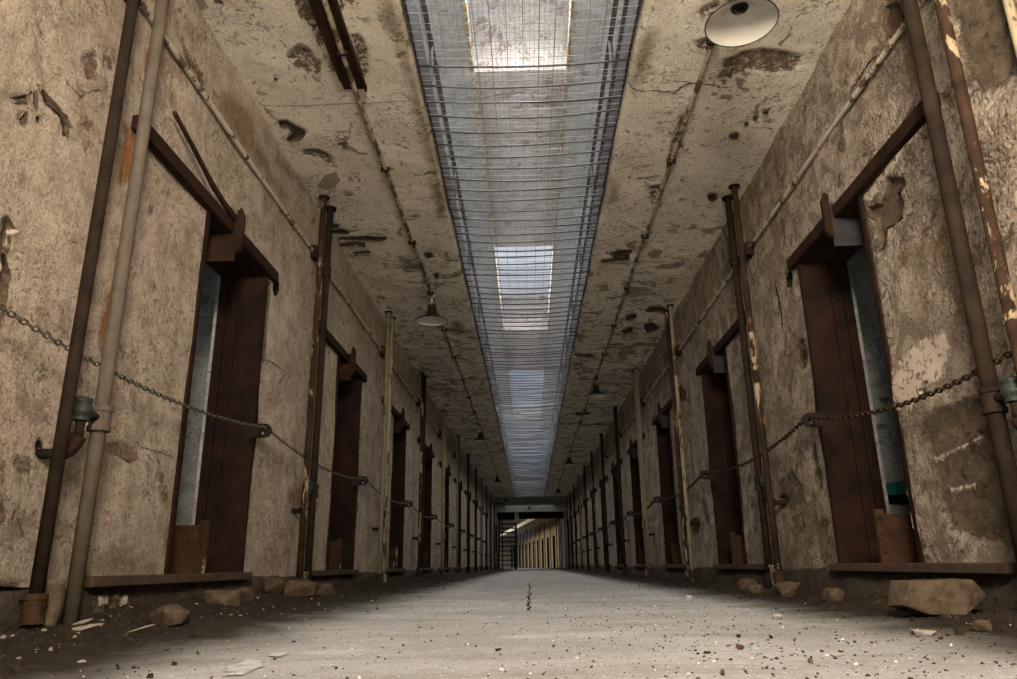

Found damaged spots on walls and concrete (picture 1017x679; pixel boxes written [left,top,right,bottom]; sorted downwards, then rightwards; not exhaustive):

spalling [11,84,95,135]
peeling [84,50,112,81]
peeling [287,0,335,74]
peeling [351,34,370,76]
crack [627,81,733,94]
peeling [719,49,801,84]
spalling [947,0,1017,91]
spalling [278,120,340,190]
spalling [867,178,905,251]